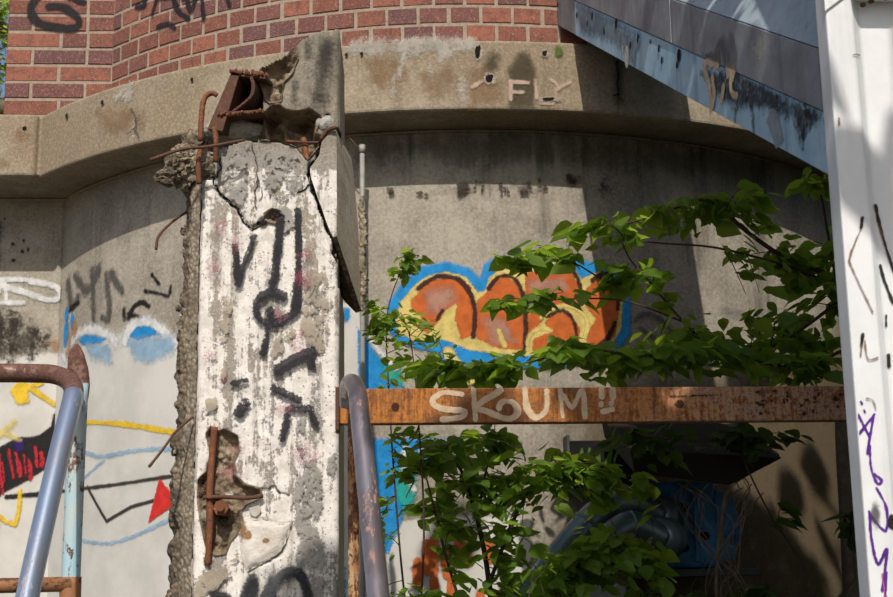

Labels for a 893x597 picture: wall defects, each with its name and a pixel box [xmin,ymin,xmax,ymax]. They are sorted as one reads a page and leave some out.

crack [205,148,265,231]
spalling [256,45,337,232]
crack [297,139,324,203]
leakage [456,180,484,197]
leakage [499,177,548,195]
peeling [709,71,821,148]
leakage [0,310,58,363]
spalling [148,91,263,597]
peeling [271,269,333,359]
rust [670,394,713,408]
rust [755,390,820,416]
peeling [291,414,338,597]